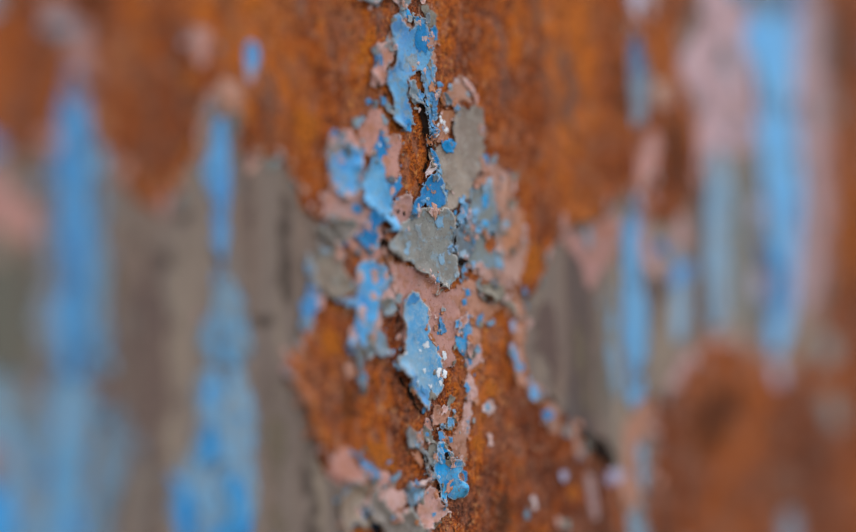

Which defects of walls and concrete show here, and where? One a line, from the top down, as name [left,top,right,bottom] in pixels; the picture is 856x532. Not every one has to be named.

rust [0,0,442,223]
peeling [299,0,599,532]
rust [280,0,702,532]